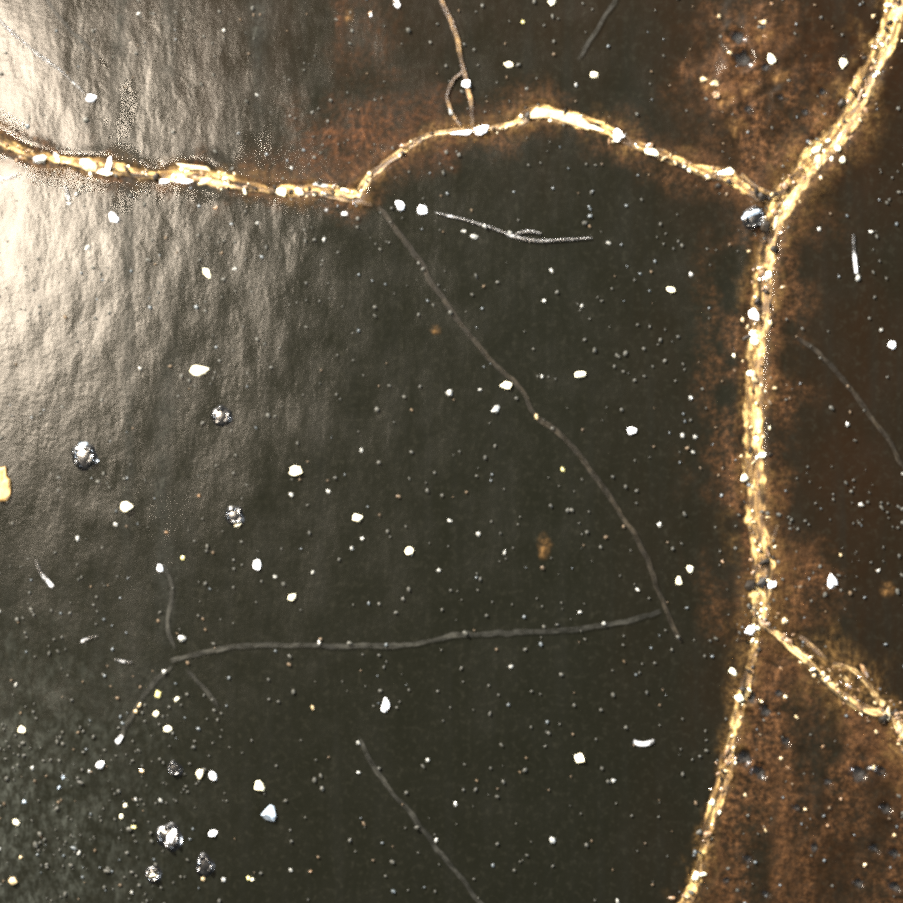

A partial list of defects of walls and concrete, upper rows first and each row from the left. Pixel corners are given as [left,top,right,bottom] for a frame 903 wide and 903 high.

crack [0,0,616,206]
crack [619,0,903,903]